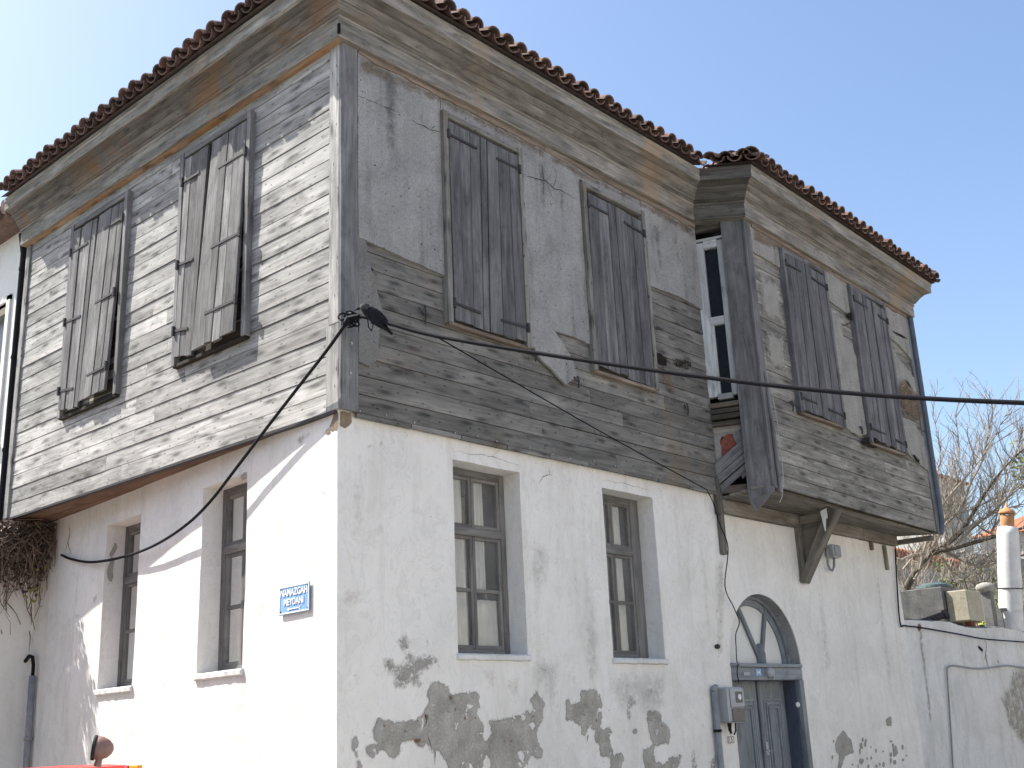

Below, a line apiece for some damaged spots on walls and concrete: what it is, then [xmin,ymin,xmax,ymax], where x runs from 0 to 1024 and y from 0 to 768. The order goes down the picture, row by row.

crack [524,169,576,200]
flaking render [387,636,436,687]
flaking render [352,681,545,768]
flaking render [566,689,624,768]
flaking render [627,700,696,768]
flaking render [832,731,907,768]